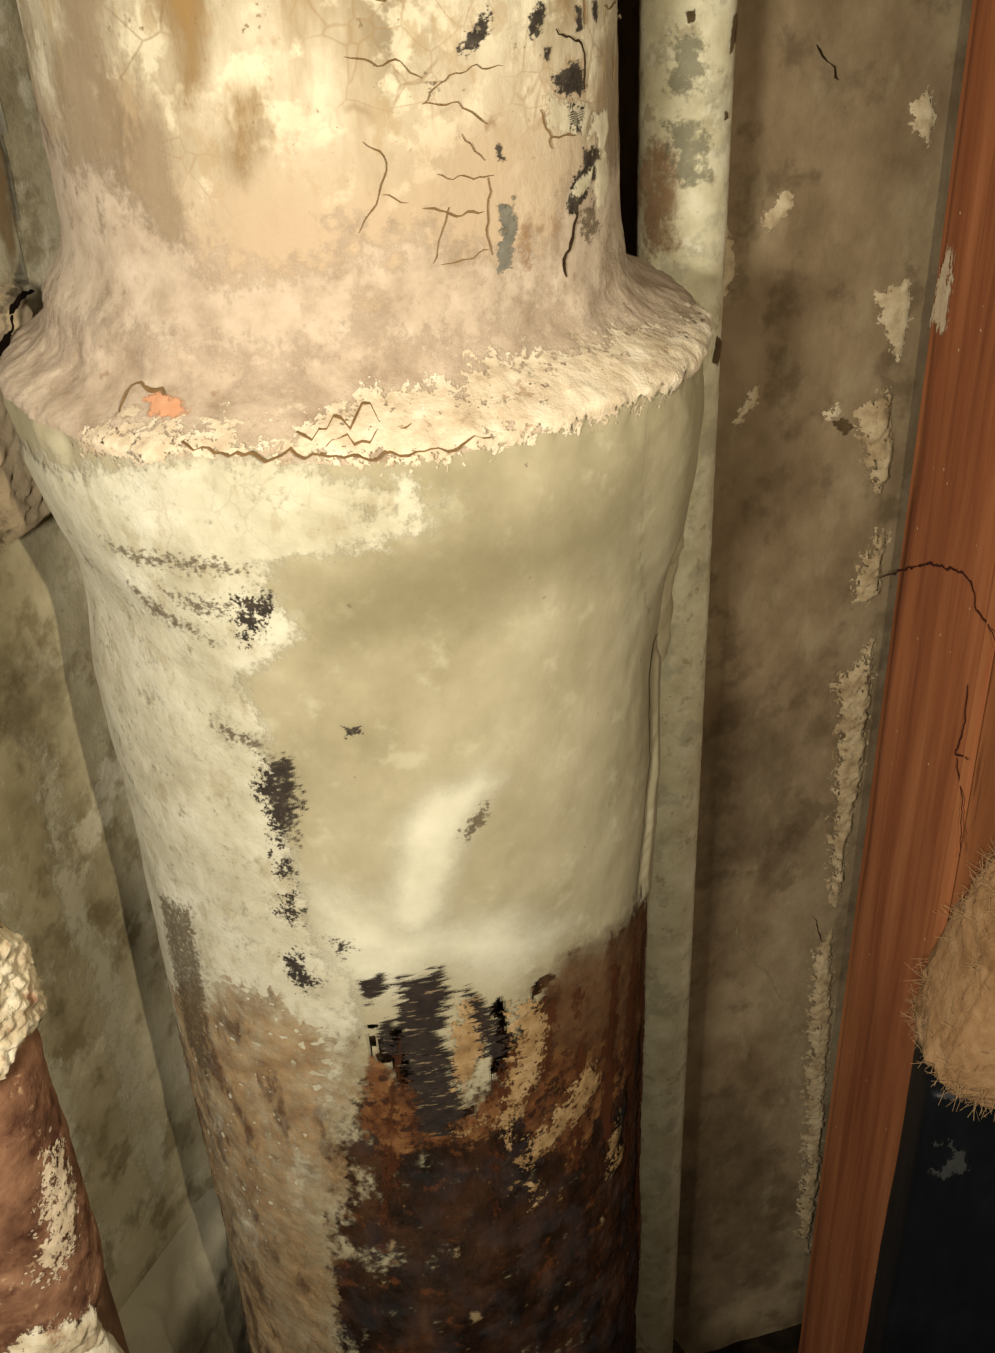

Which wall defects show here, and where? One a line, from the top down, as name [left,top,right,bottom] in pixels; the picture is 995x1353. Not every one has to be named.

peeling [456,5,493,57]
peeling [730,11,738,54]
crack [346,57,501,265]
crack [541,110,576,149]
peeling [524,0,609,277]
peeling [496,196,519,274]
crack [0,289,35,356]
spalling [833,386,897,497]
spalling [849,522,893,607]
peeling [18,294,722,1266]
rust [169,884,649,1353]